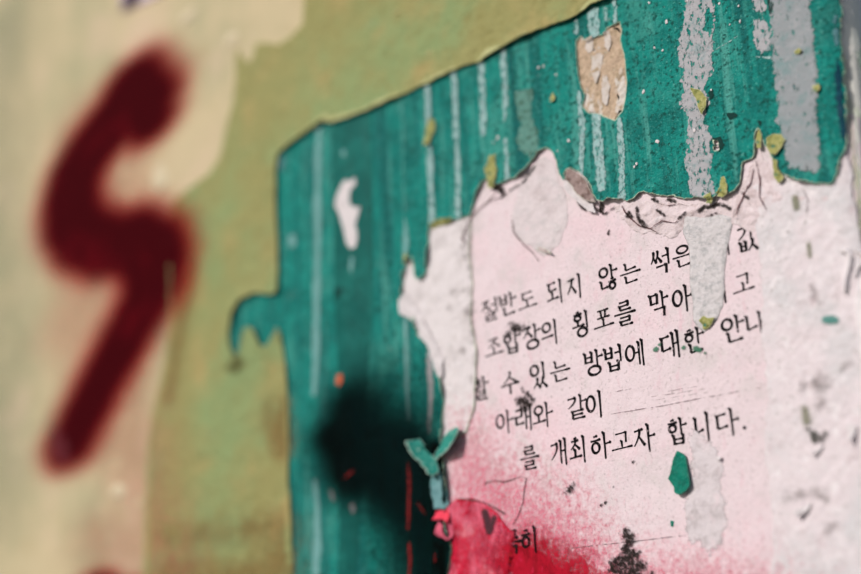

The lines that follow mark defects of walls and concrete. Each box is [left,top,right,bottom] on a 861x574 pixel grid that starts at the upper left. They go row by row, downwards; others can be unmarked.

peeling [228,0,861,574]